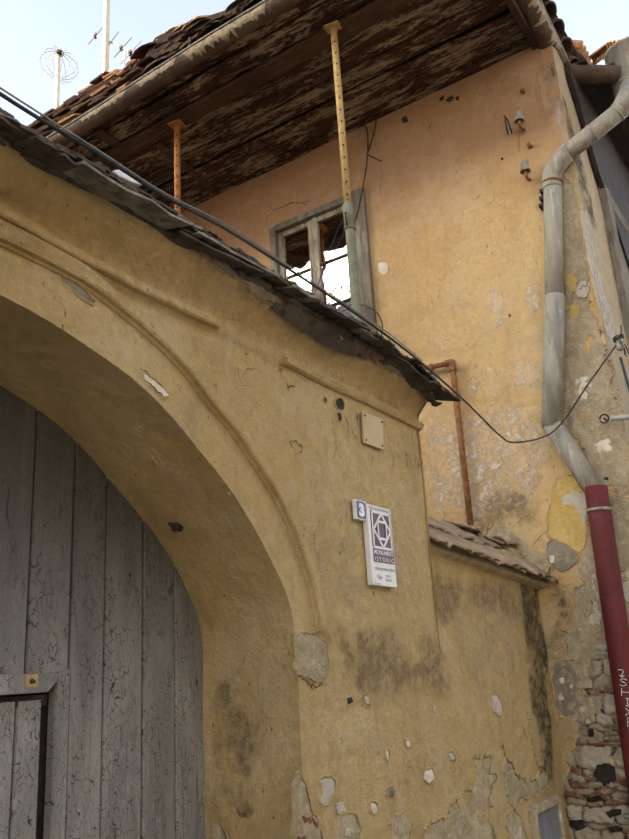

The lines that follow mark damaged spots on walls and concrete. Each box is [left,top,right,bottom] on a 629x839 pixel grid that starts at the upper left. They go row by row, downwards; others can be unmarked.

spalling [140,371,170,401]
peeling [562,178,629,625]
spalling [290,770,362,839]
spalling [421,713,549,839]
water stain [522,584,553,778]
spalling [544,474,606,786]